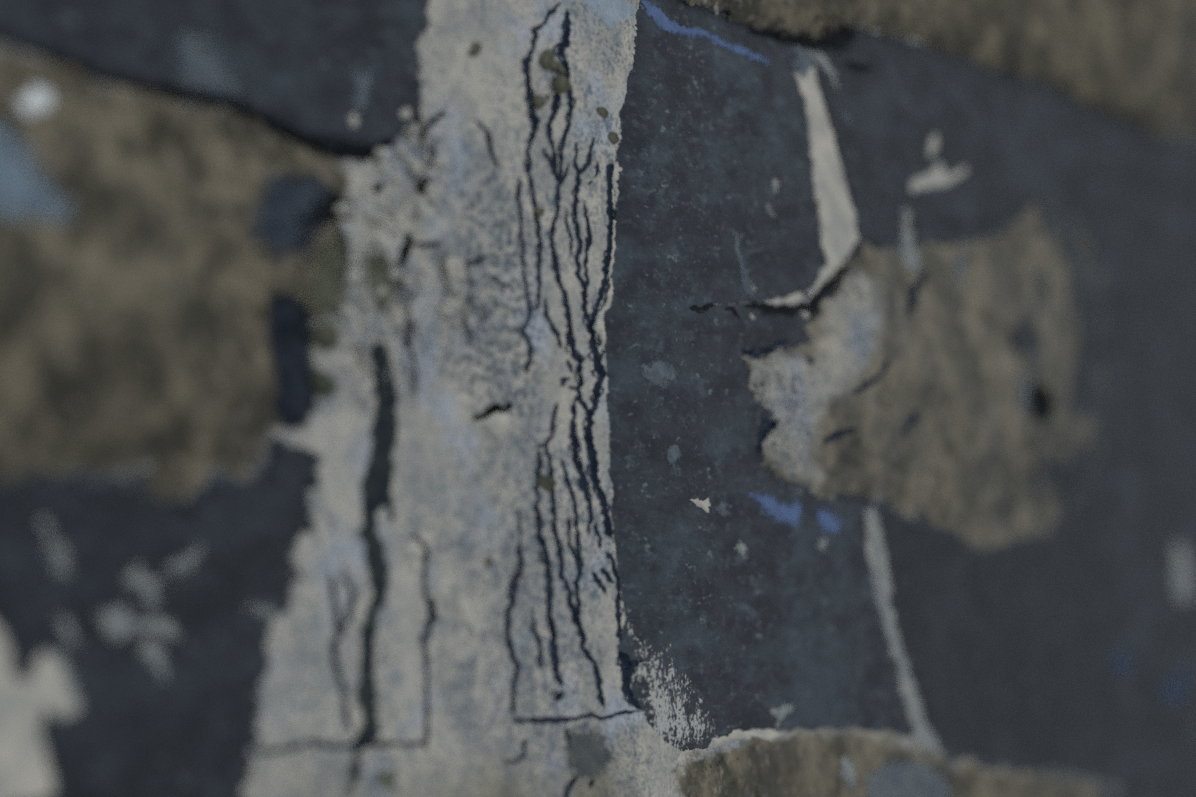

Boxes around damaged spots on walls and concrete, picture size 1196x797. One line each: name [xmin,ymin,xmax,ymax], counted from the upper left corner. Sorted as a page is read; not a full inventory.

crack [22,45,445,251]
flaking render [612,162,622,202]
flaking render [730,48,859,306]
flaking render [595,220,616,353]
crack [411,1,640,764]
peeling [642,361,675,389]
peeling [690,498,727,517]
peeling [96,542,203,681]
crack [252,533,439,755]
flaking render [840,507,950,797]
crack [564,776,594,797]
peeling [707,703,794,750]